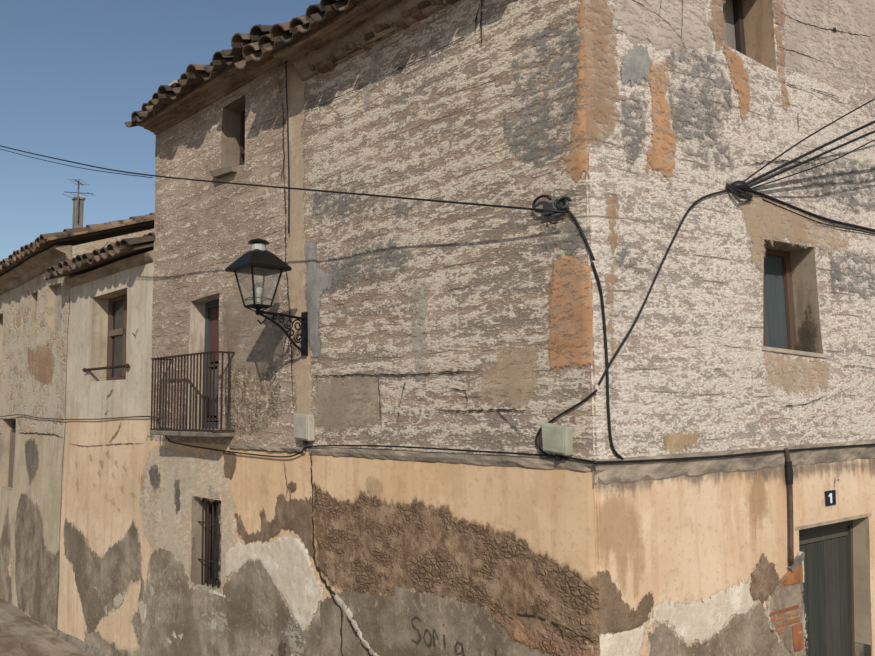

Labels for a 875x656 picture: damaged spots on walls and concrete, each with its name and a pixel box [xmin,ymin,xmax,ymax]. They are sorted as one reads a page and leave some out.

flaking render [0,492,601,656]
crack [310,452,373,656]
water stain [597,569,654,634]
flaking render [646,551,808,656]